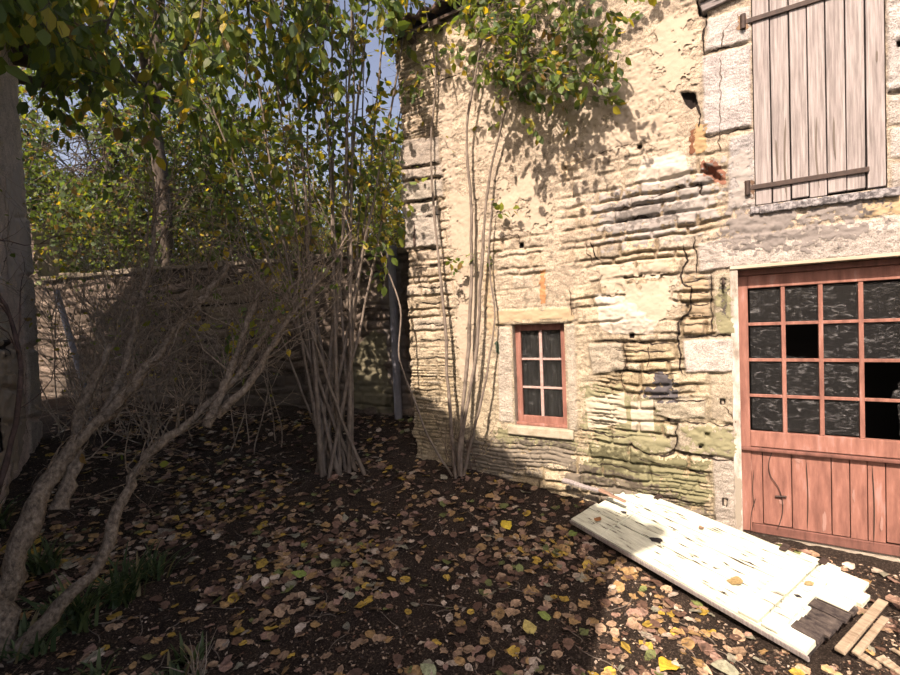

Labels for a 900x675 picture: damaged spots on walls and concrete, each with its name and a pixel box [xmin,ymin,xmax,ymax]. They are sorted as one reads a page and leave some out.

corrosion [689,123,726,185]
spalling [858,196,900,218]
crack [598,238,731,391]
leakage [447,436,717,521]
crack [578,397,736,509]